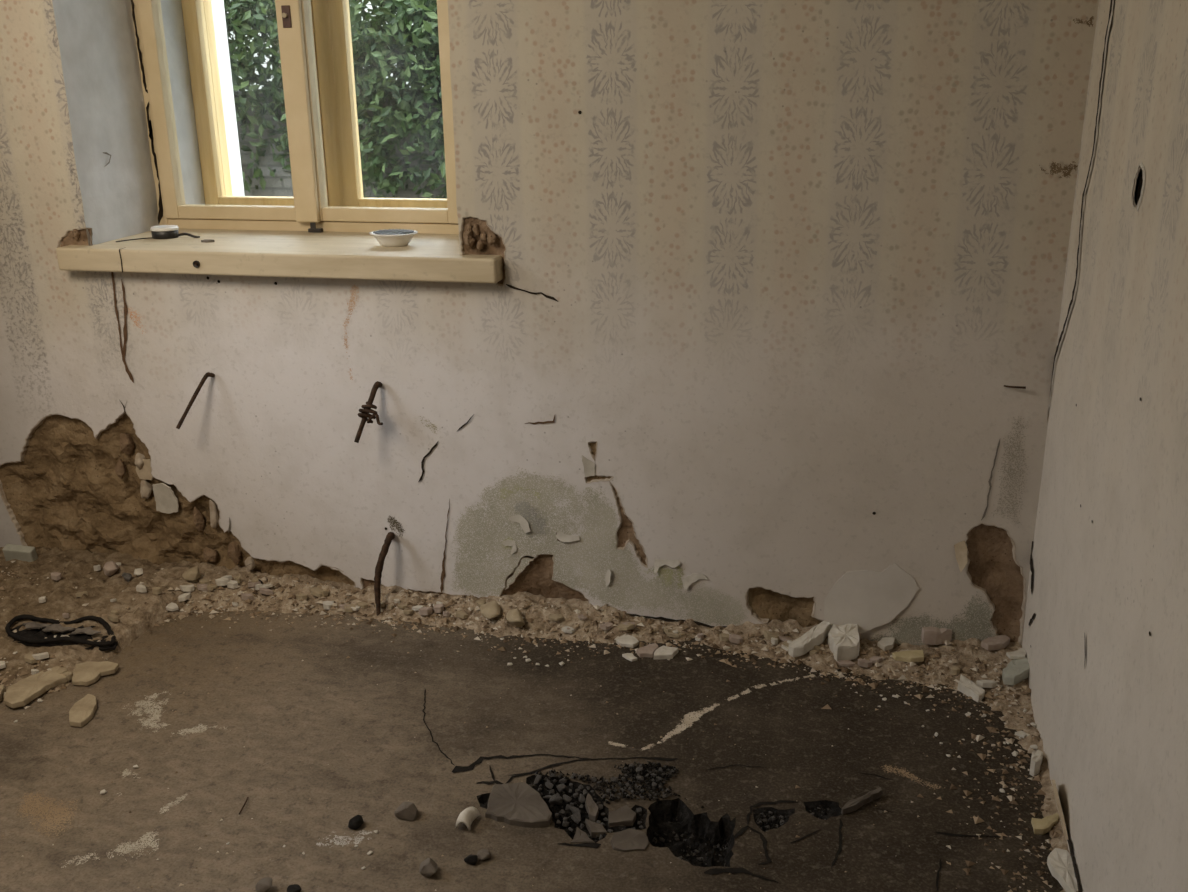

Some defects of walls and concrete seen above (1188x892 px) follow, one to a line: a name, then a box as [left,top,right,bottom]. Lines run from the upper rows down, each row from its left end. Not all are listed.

spalling [460,216,506,286]
crack [1047,0,1114,415]
spalling [0,412,920,635]
spalling [954,523,1026,645]
crack [422,689,678,785]
crack [558,841,601,849]
crack [704,800,843,883]